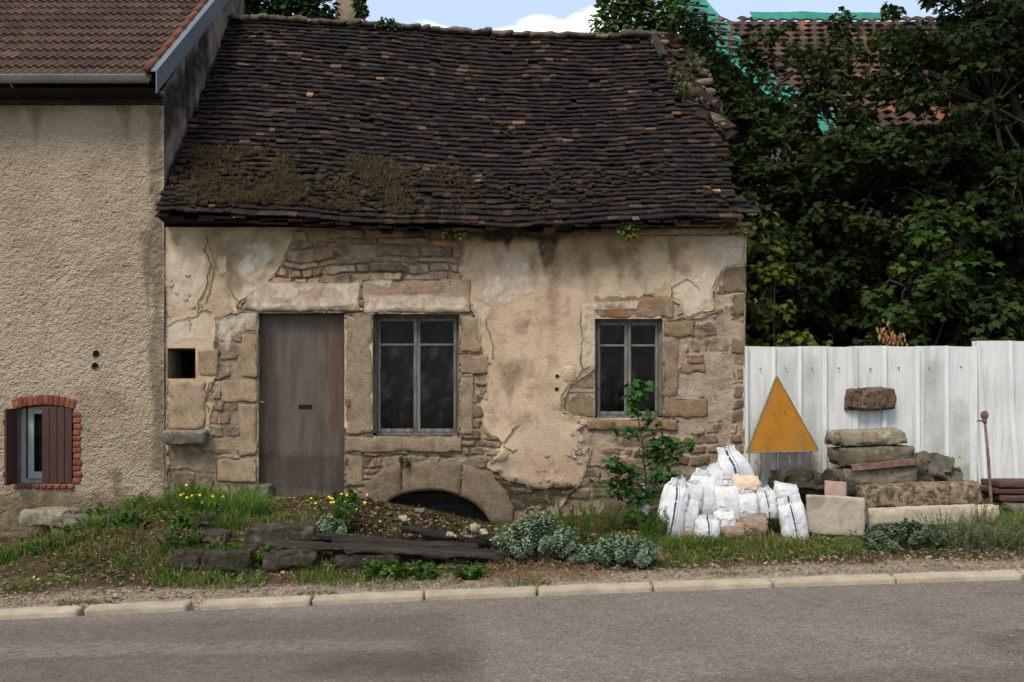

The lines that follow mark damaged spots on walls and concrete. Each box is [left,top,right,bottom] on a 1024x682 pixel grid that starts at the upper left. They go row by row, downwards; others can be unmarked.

crack [164,231,292,486]
flaking render [164,227,745,522]
water stain [476,229,558,265]